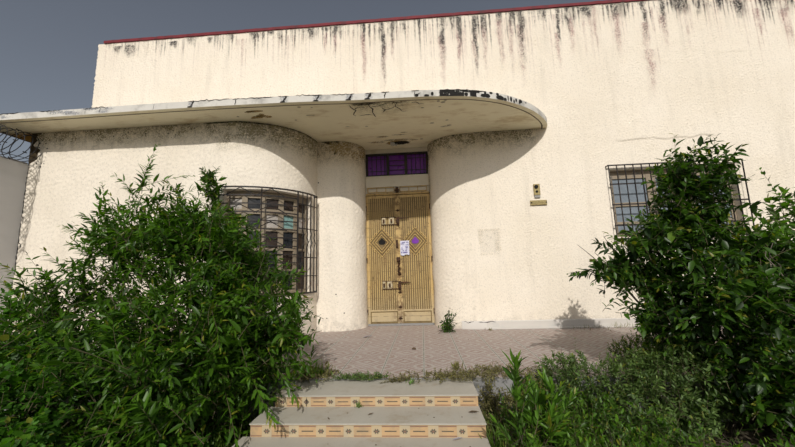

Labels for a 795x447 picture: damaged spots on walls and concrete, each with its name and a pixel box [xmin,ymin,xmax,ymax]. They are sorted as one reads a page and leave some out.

damp [251,26,338,45]
damp [362,21,406,57]
damp [414,17,461,44]
damp [472,11,524,55]
damp [556,6,590,38]
damp [602,0,742,20]
crack [346,90,423,117]
peeling [415,89,526,104]
damp [28,124,195,167]
damp [206,121,365,160]
damp [427,129,531,153]